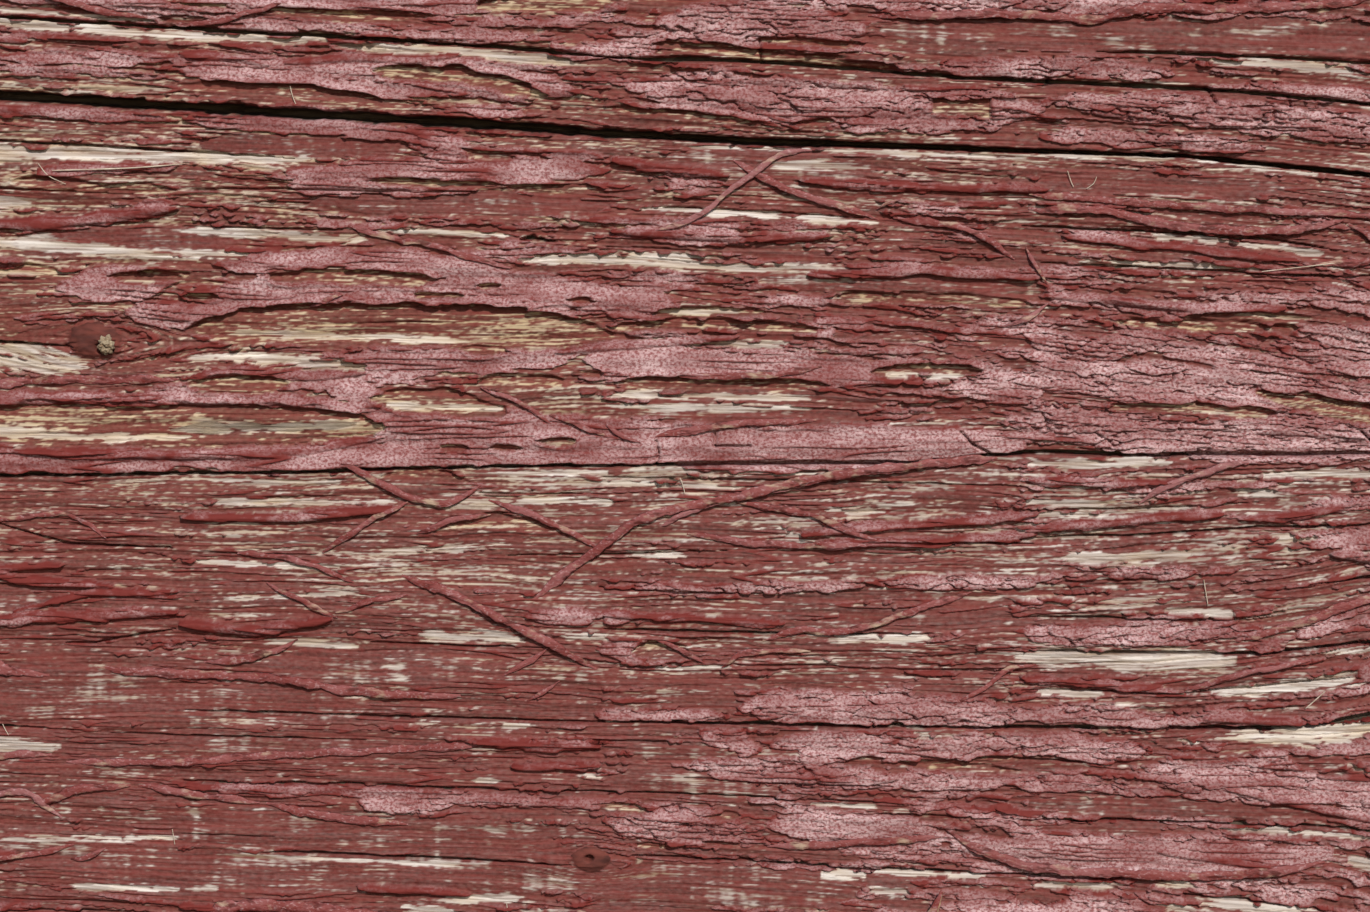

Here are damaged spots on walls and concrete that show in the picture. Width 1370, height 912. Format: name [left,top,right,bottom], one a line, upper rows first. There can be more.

peeling [49,131,607,185]
crack [0,90,1370,176]
peeling [0,236,177,261]
peeling [180,278,900,388]
peeling [0,360,1370,474]
crack [0,462,687,482]
crack [850,445,1189,485]
peeling [1015,606,1262,671]
peeling [1211,672,1355,700]
peeling [741,691,1152,765]
peeling [1216,722,1370,748]
peeling [768,811,1315,889]